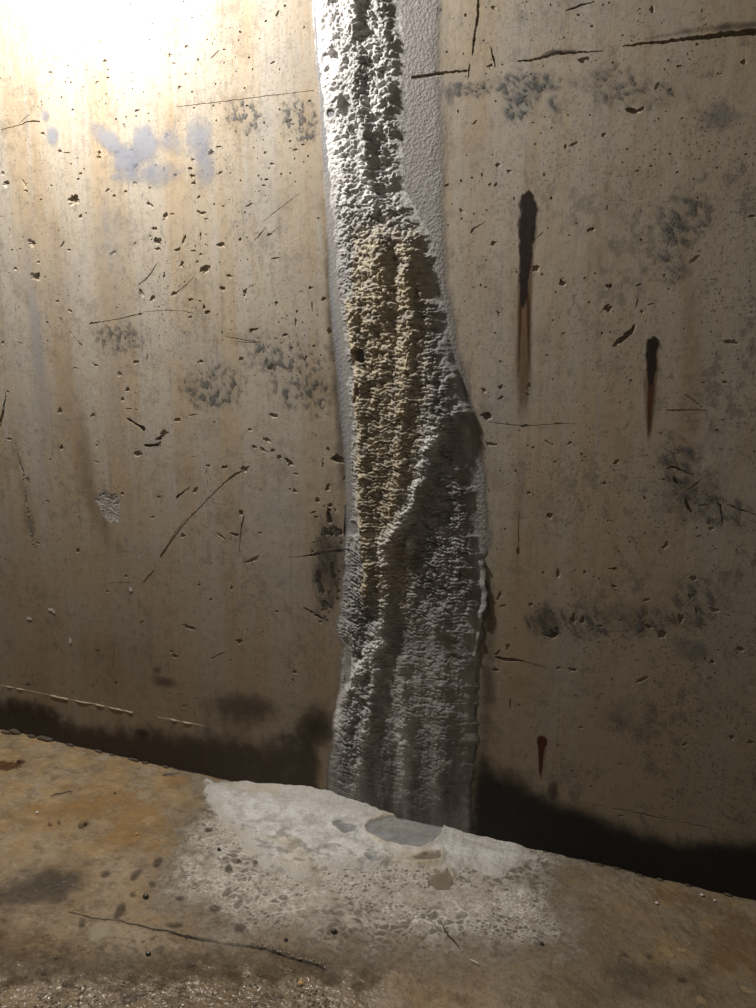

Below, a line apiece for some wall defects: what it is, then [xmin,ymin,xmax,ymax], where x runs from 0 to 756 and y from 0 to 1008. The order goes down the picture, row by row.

crack [412,0,496,79]
hole [444,173,498,230]
rust [517,190,537,401]
rust [643,336,659,431]
spalling [309,446,345,623]
rust [537,736,547,776]
leakage [0,699,756,958]
crack [65,910,328,973]